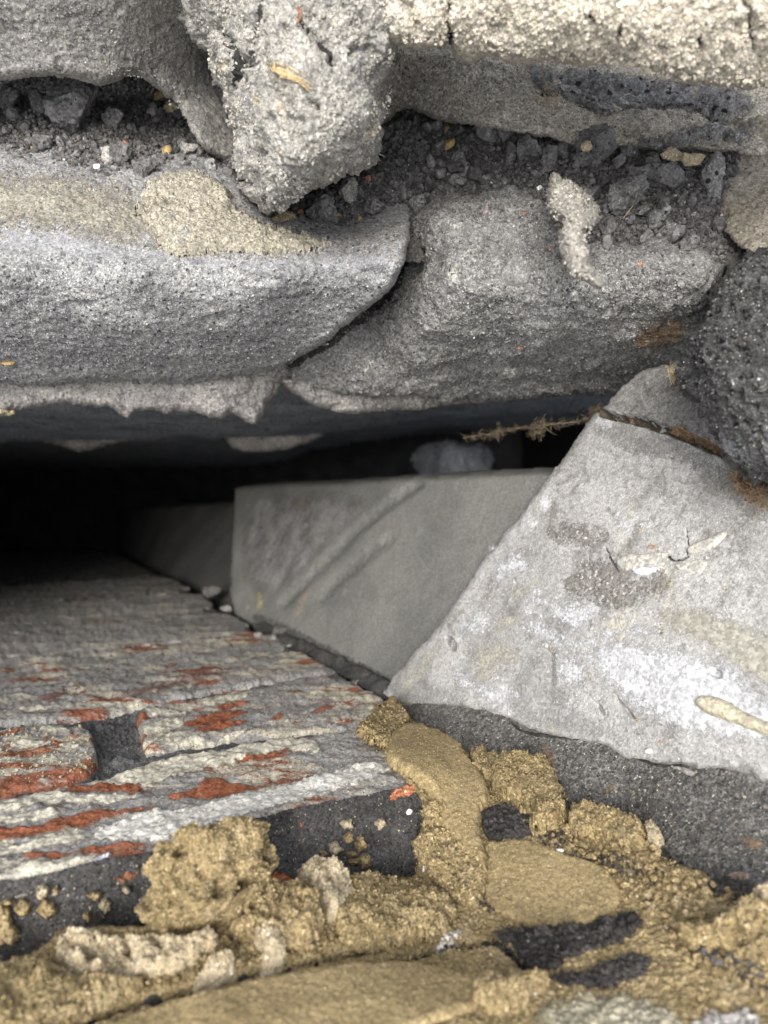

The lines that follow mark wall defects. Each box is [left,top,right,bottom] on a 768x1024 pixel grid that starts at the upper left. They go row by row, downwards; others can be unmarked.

crack [669,535,690,562]
peeling [184,701,247,731]
peeling [0,736,53,769]
peeling [65,712,150,793]
peeling [235,747,289,763]
peeling [169,765,271,800]
peeling [0,804,156,840]
peeling [24,841,146,859]